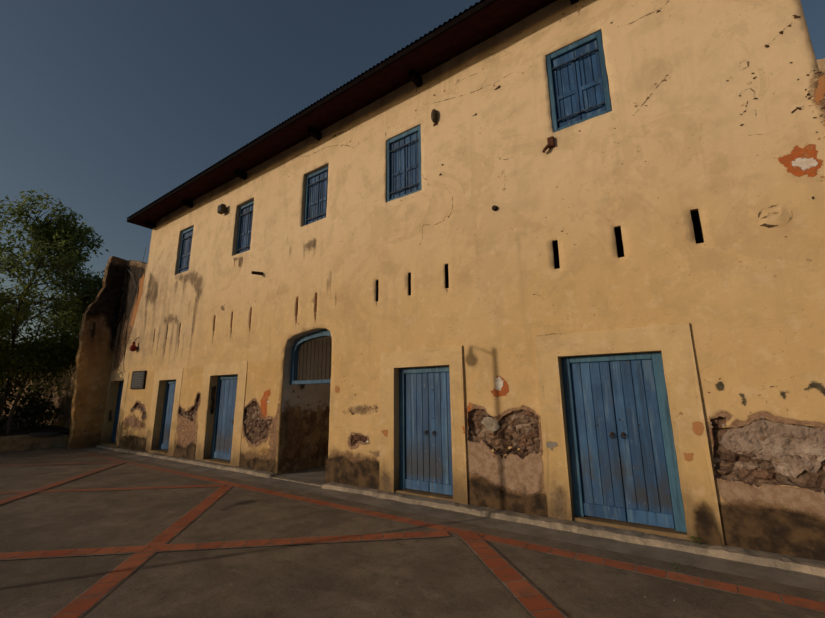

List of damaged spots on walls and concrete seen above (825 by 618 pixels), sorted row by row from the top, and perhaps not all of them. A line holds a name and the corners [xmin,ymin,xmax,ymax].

peeling [773,115,825,181]
water stain [179,272,202,295]
flaking render [122,401,146,431]
flaking render [176,392,201,448]
spalling [242,389,280,464]
spalling [348,433,369,449]
peeling [489,376,509,397]
spalling [462,402,557,495]
spalling [693,411,825,517]
water stain [805,381,825,395]
water stain [468,473,566,520]
water stain [694,499,825,562]